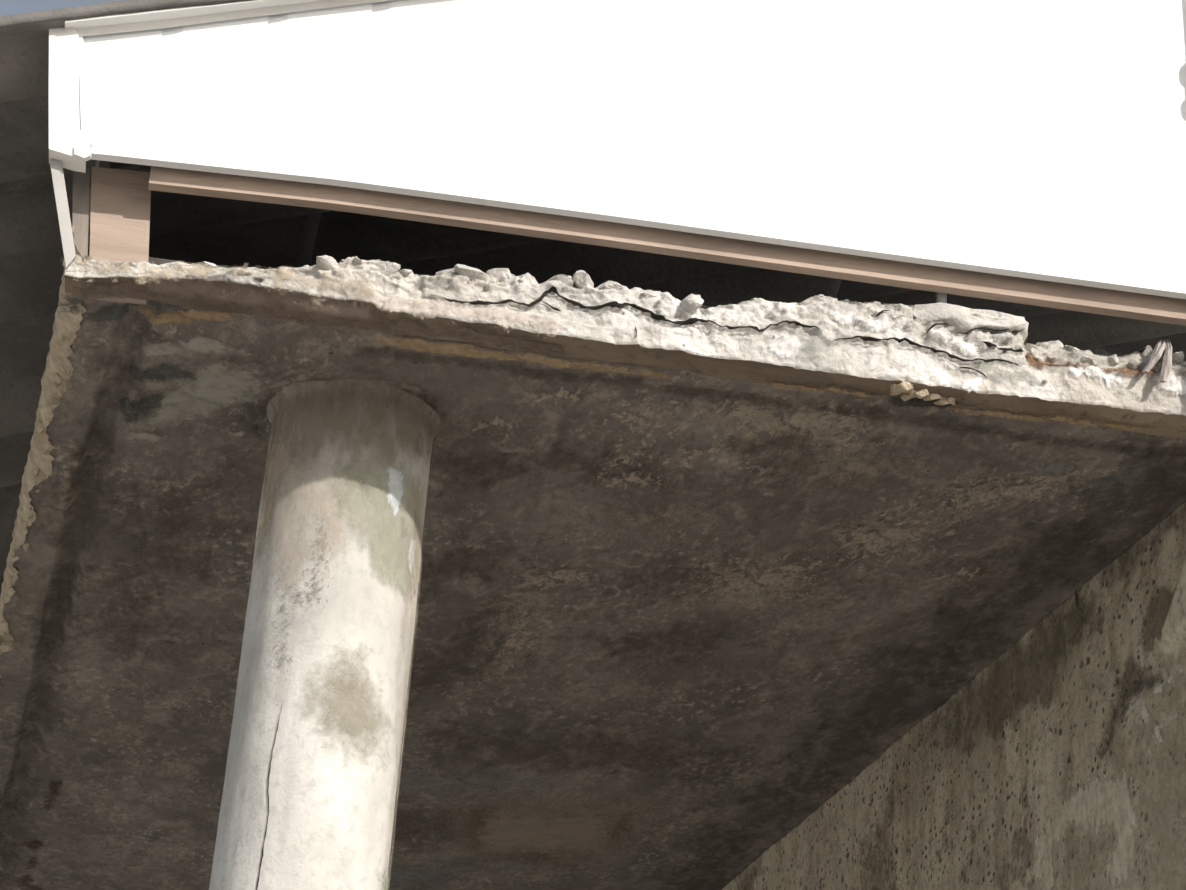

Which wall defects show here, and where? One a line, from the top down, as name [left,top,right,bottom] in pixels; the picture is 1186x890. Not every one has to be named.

leakage [100,330,197,422]
spalling [281,255,346,274]
spalling [435,264,623,291]
spalling [680,293,704,313]
crack [435,286,1025,378]
peeling [913,302,1155,384]
spalling [0,222,90,655]
leakage [256,378,443,570]
leakage [661,418,1186,890]
leakage [322,660,381,752]
crack [256,706,282,890]
leakage [383,808,476,890]